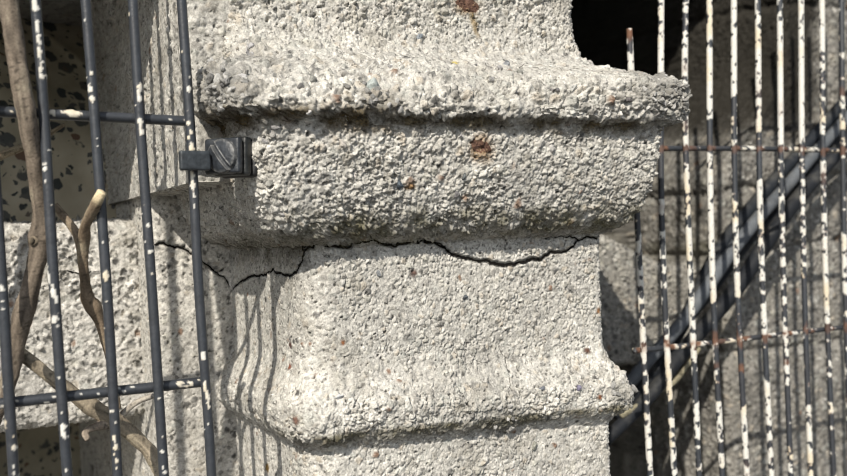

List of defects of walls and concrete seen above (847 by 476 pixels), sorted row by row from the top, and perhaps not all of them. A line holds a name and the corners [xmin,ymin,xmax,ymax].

corrosion [455,0,479,30]
corrosion [471,139,491,158]
crack [154,235,597,290]